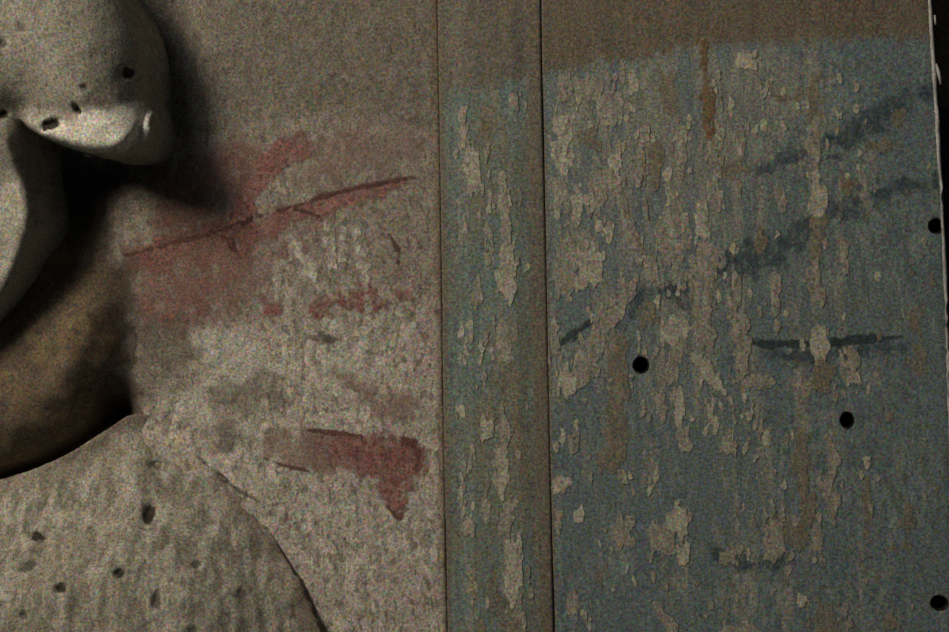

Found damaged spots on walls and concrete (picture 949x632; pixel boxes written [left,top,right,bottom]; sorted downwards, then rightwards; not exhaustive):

rust [699,40,716,146]
peeling [453,104,530,390]
peeling [548,50,927,498]
spalling [926,0,949,429]
peeling [458,404,534,632]
peeling [553,504,584,536]
peeling [598,513,636,554]
peeling [646,499,692,591]
peeling [719,544,751,566]
peeling [741,430,853,632]
peeling [566,590,592,631]